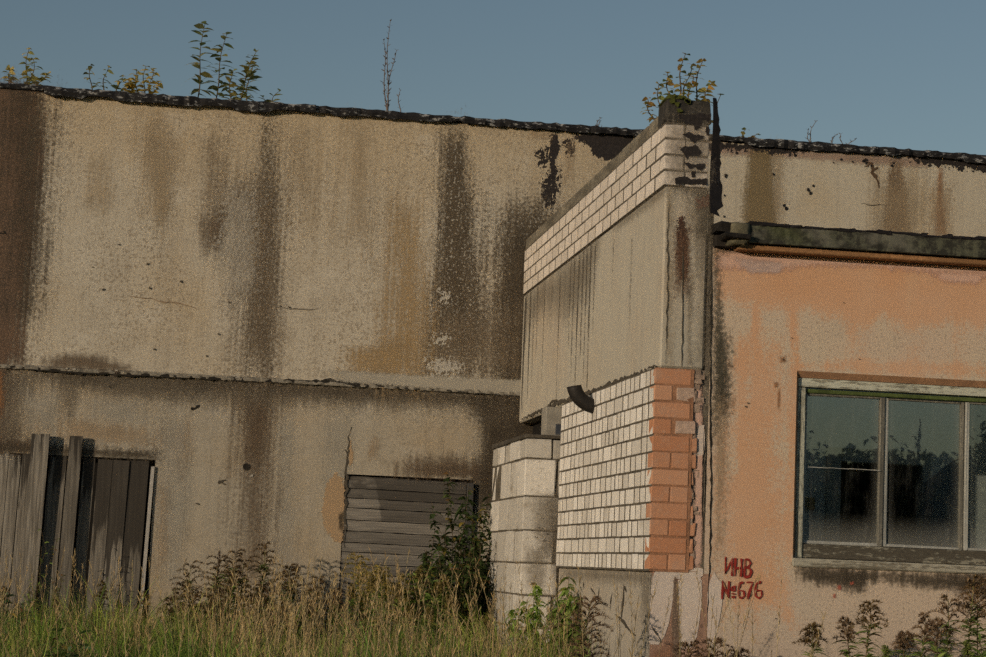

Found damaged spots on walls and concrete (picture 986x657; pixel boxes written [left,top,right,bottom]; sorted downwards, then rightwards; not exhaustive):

water stain [0,76,57,455]
water stain [43,113,595,579]
crack [0,199,684,419]
peeling [534,131,635,210]
corrosion [675,216,690,293]
water stain [694,198,733,426]
water stain [742,149,778,223]
peeling [719,252,986,285]
water stain [883,159,910,232]
crack [343,427,352,547]
crack [702,237,713,626]
water stain [654,577,680,657]